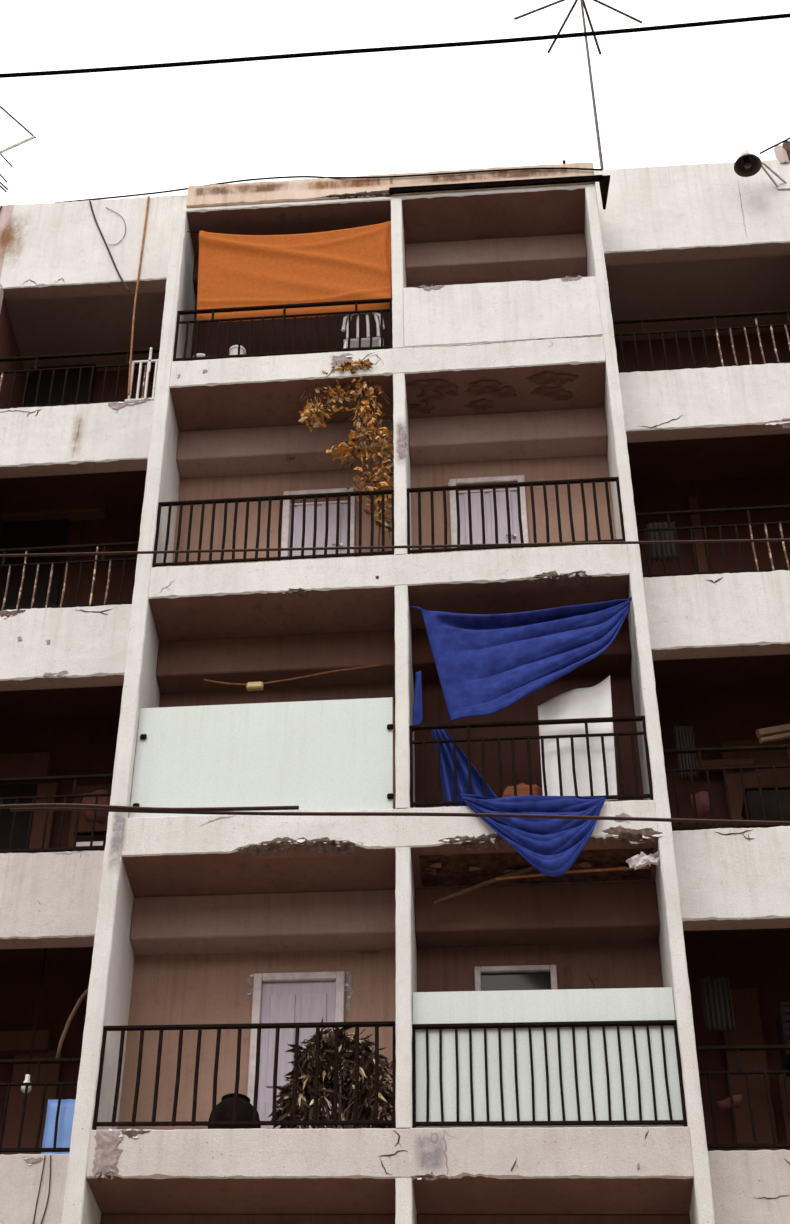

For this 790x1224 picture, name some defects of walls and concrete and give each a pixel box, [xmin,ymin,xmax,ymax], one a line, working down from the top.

spalling [236,837,363,857]
spalling [565,813,663,874]
spalling [92,1129,150,1180]
crack [379,1130,457,1175]